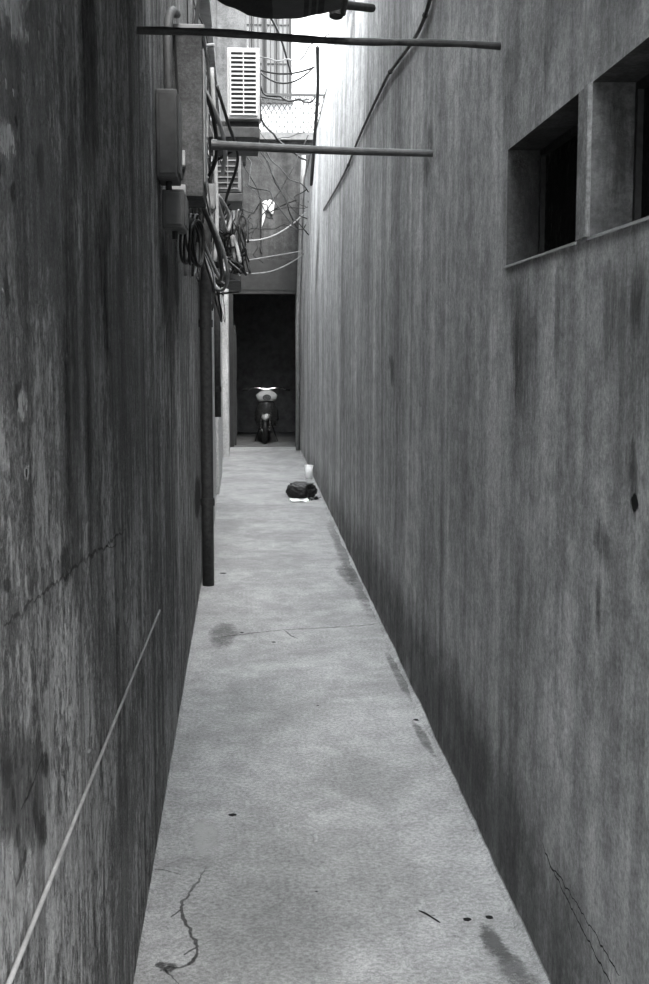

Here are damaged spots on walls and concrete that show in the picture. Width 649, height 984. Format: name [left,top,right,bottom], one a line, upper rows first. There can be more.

crack [4,532,123,626]
leakage [1,720,48,850]
leakage [349,544,566,984]
crack [155,869,203,984]